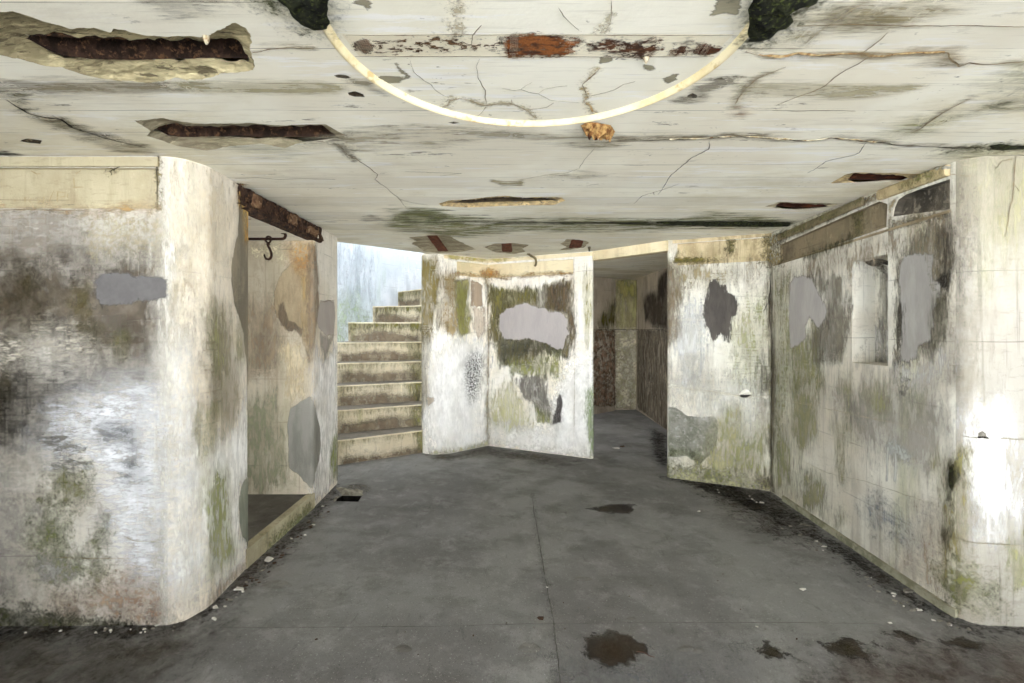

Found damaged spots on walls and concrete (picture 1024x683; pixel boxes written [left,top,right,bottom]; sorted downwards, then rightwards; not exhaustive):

spalling [0,11,255,83]
rust [352,31,722,60]
crack [355,2,1020,118]
spalling [134,118,355,151]
rust [237,183,262,241]
spalling [439,196,565,207]
crack [520,100,1019,237]
leakage [0,204,175,470]
leakage [100,421,136,482]
peeling [43,176,248,626]
peeling [231,201,338,539]
spalling [668,303,770,466]